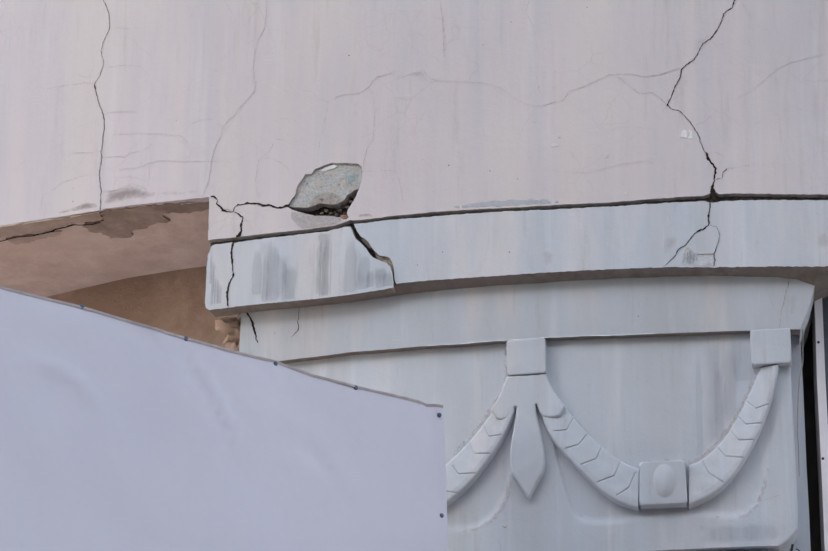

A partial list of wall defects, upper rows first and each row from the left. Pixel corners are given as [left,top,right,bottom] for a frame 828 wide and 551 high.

peeling [0,201,209,245]
spalling [205,163,397,351]
crack [0,0,828,343]